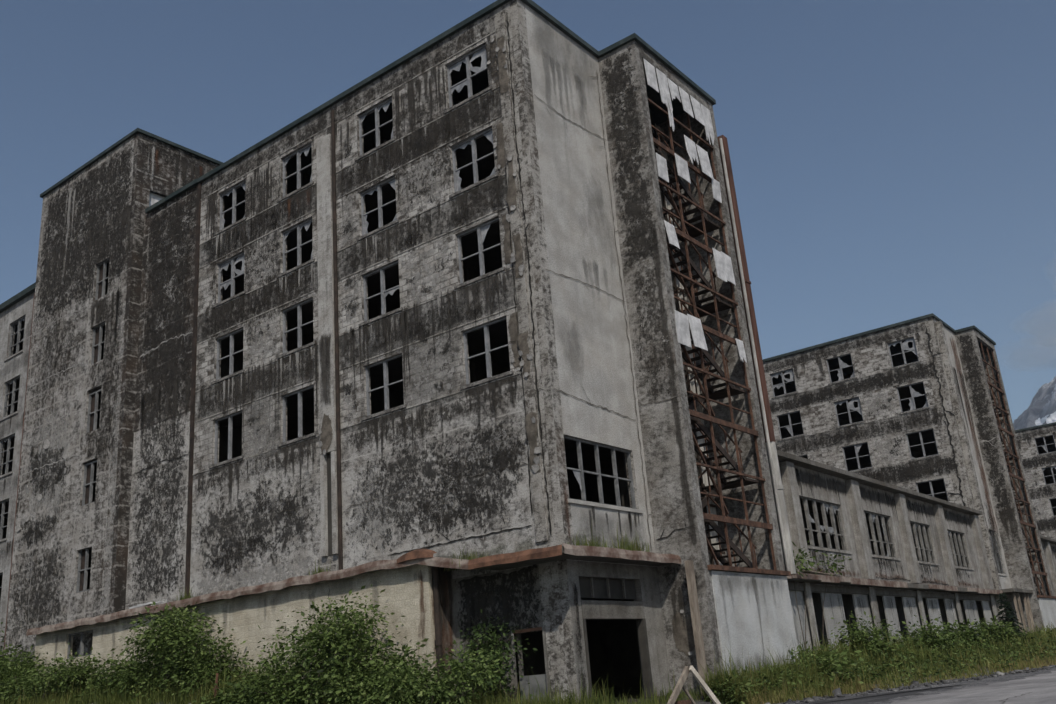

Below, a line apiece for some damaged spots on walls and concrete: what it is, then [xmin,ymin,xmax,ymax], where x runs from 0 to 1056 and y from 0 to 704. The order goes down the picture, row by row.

damp [139,22,509,448]
damp [24,141,136,613]
damp [346,375,522,459]
crack [924,328,966,506]
damp [350,466,398,554]